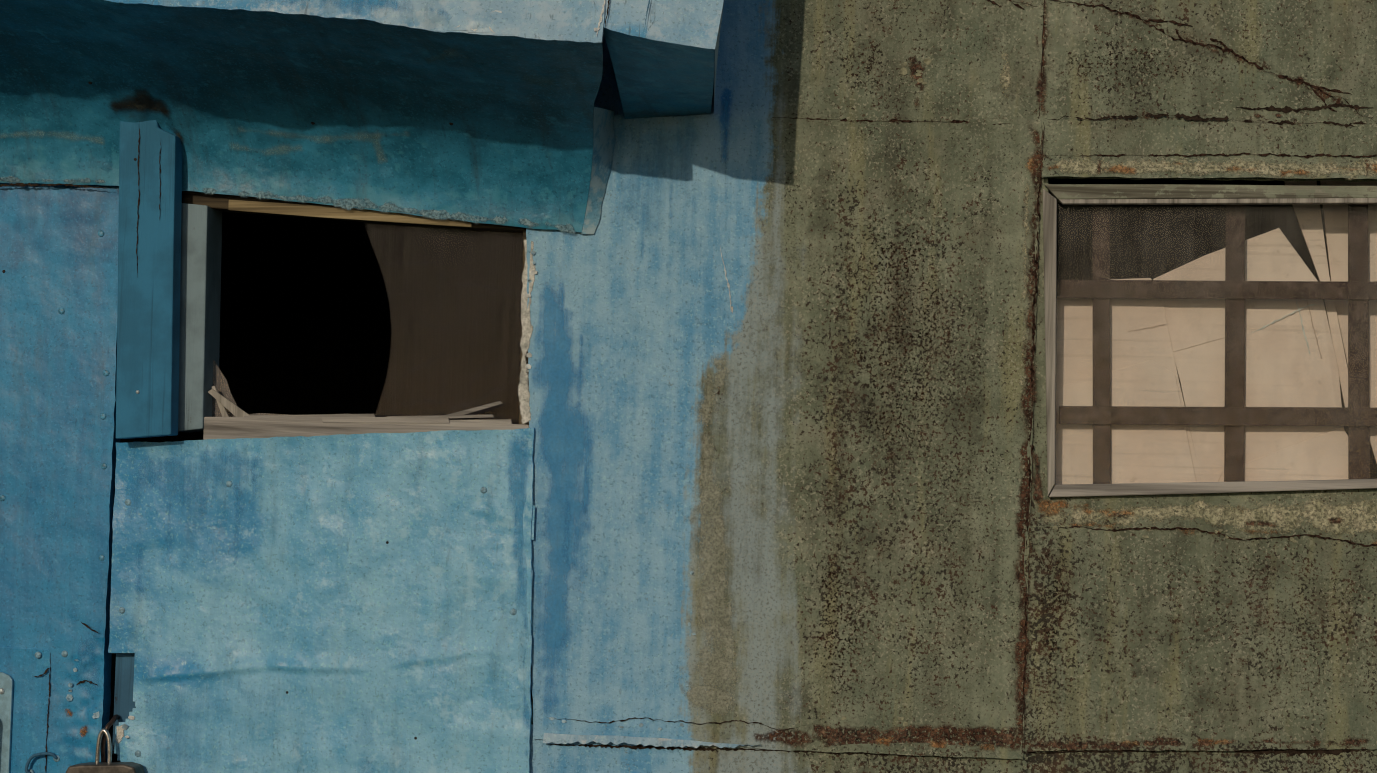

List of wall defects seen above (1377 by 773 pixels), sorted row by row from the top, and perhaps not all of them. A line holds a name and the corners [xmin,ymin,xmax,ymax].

corrosion [1034,0,1048,113]
corrosion [1071,41,1225,119]
crack [987,0,1373,120]
corrosion [750,131,1377,758]